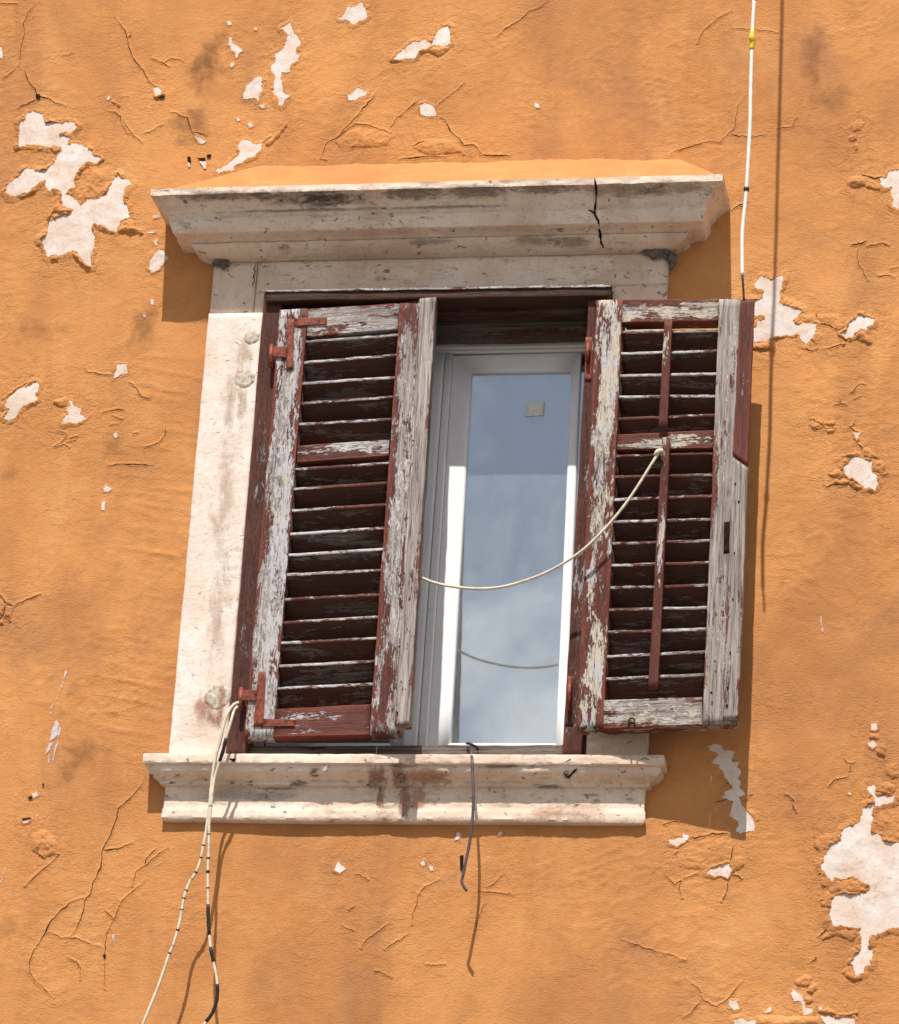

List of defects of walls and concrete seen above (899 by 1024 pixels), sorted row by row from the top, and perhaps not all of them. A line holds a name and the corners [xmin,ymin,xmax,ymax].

crack [114,16,184,87]
peeling [240,20,307,111]
crack [108,109,208,145]
crack [318,81,511,163]
peeling [0,94,139,272]
crack [588,178,604,248]
peeling [741,269,823,350]
peeling [838,431,884,494]
peeling [703,736,763,840]
crack [23,776,169,1002]
crack [662,818,744,903]
peeling [814,776,899,982]